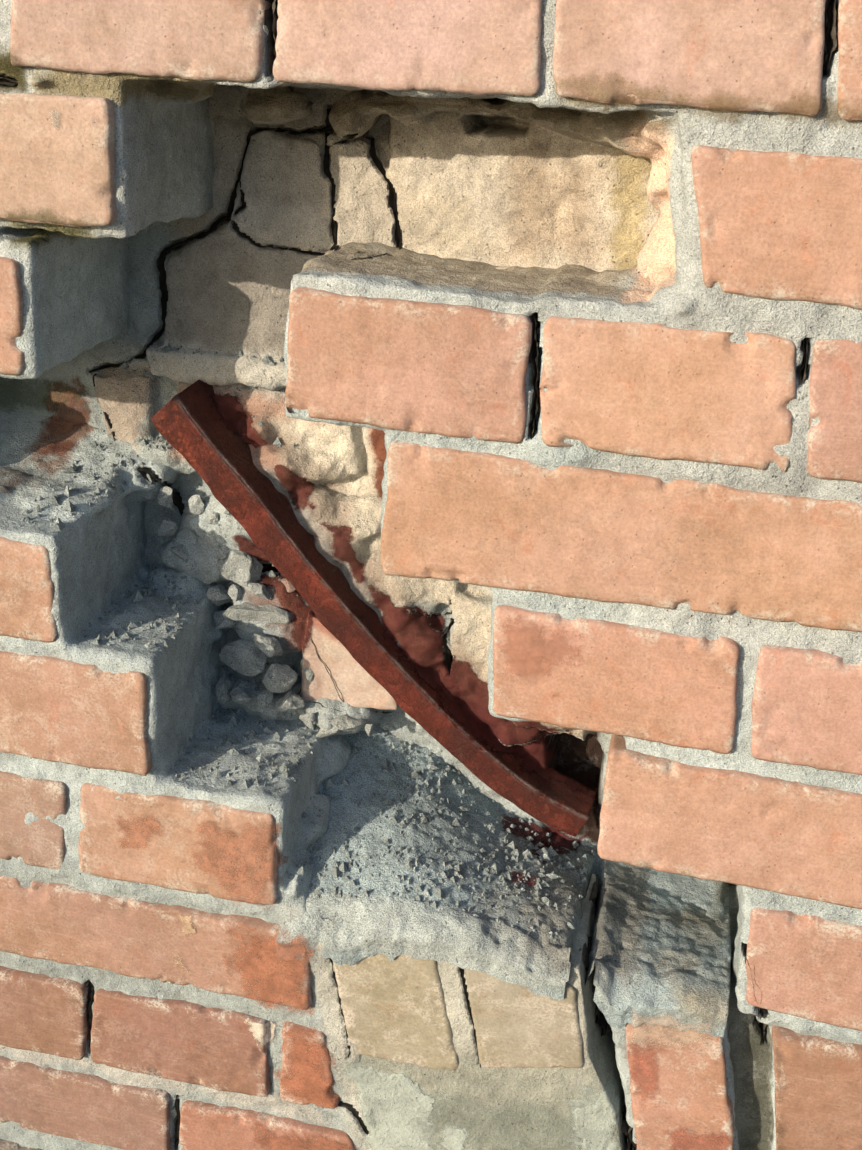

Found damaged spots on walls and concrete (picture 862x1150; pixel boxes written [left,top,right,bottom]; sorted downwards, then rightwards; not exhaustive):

crack [263,0,278,74]
crack [823,0,837,76]
crack [89,108,402,386]
crack [528,313,540,439]
rust [211,393,267,448]
rust [273,465,315,510]
spalling [370,429,387,498]
rust [233,535,315,653]
spalling [301,612,399,710]
rust [321,522,590,794]
spalling [118,817,159,848]
spalling [194,823,286,905]